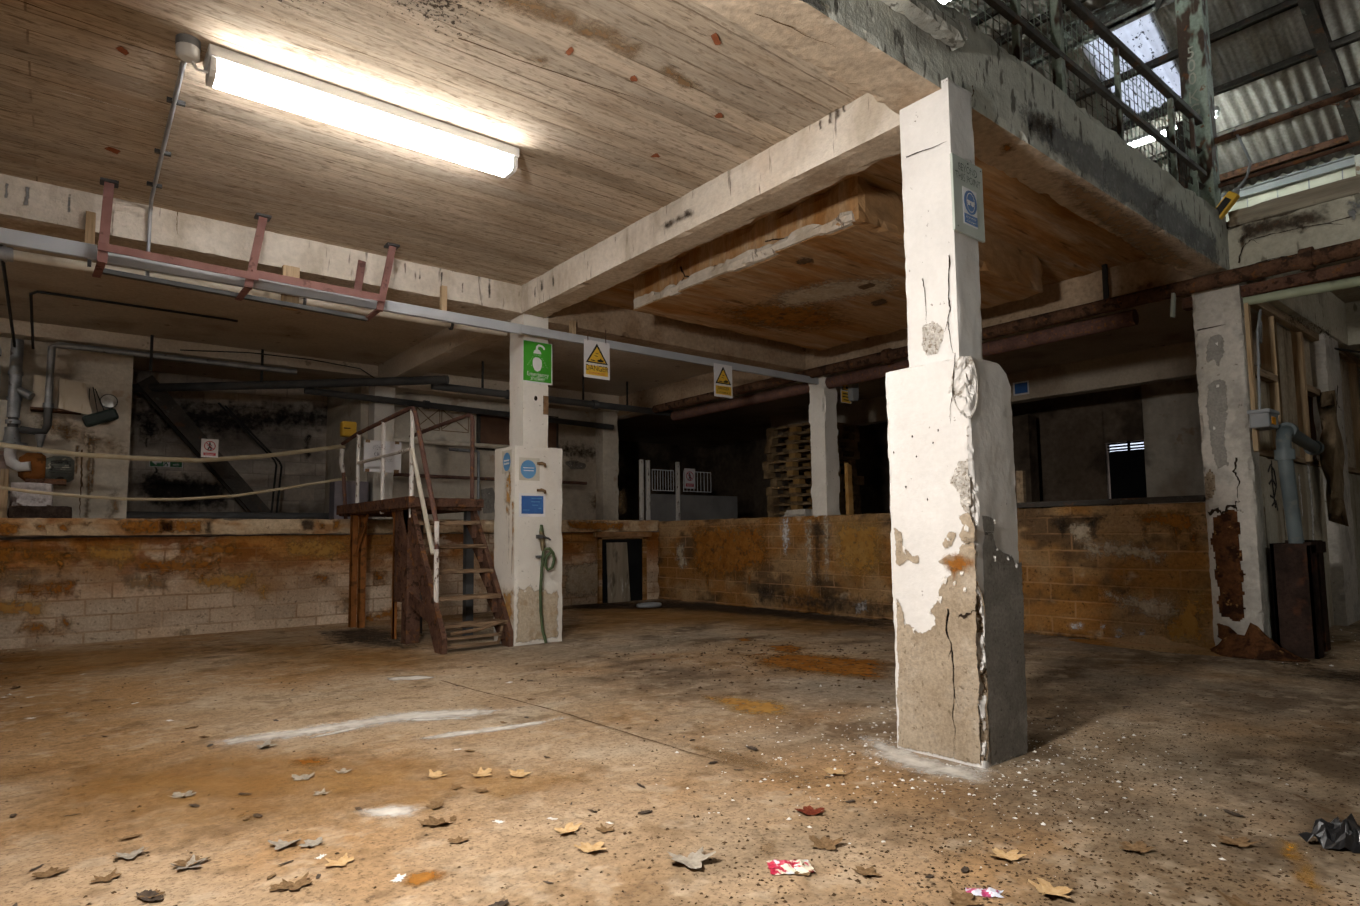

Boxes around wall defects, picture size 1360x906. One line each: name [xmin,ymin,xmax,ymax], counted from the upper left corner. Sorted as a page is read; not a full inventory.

damp [364,0,638,57]
damp [664,67,693,88]
damp [566,517,883,626]
damp [323,627,415,649]
peeling [894,459,1028,765]